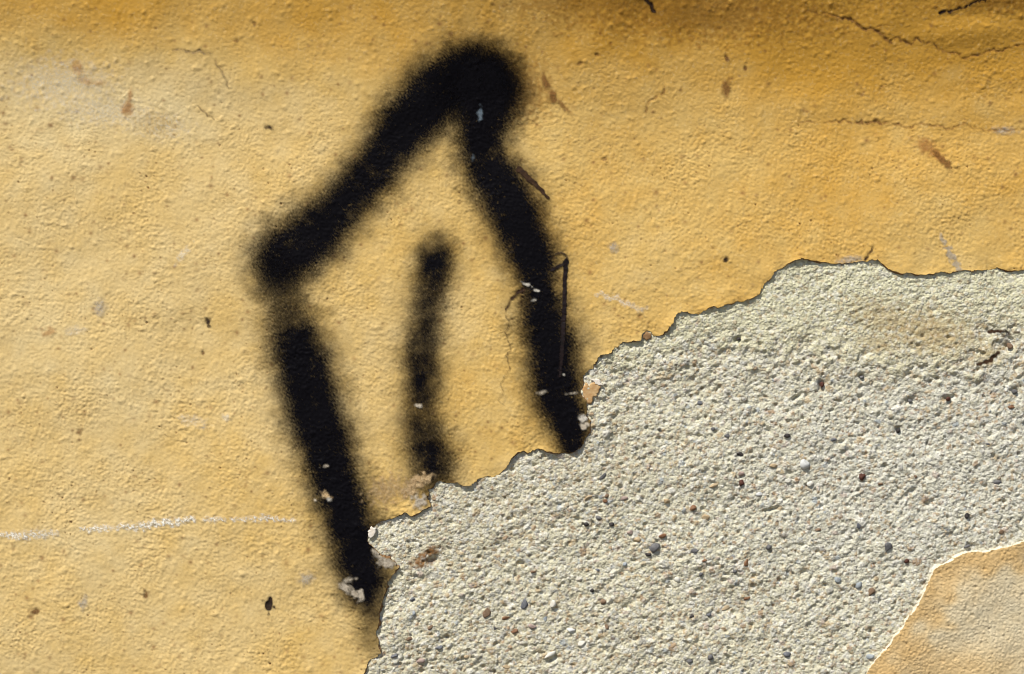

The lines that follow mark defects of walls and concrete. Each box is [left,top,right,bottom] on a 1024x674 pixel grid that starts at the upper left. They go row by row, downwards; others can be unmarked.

crack [938,0,986,14]
crack [833,15,921,44]
spalling [364,258,1024,674]